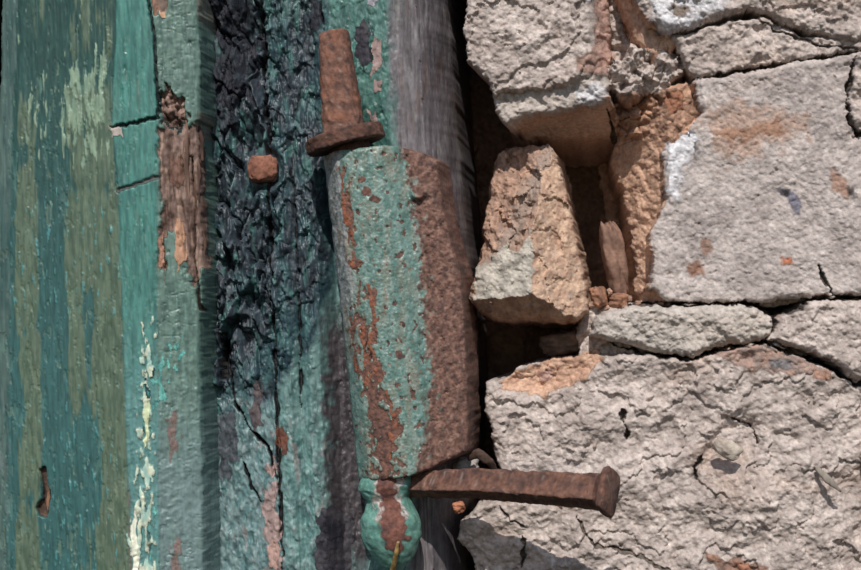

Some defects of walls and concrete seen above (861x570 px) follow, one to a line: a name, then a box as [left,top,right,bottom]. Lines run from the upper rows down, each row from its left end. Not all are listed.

crack [108,116,157,138]
crack [116,175,159,193]
peeling [157,84,212,287]
crack [692,9,861,137]
corrosion [338,150,430,553]
spalling [487,329,603,399]
peeling [37,466,51,516]
peeling [126,316,186,570]